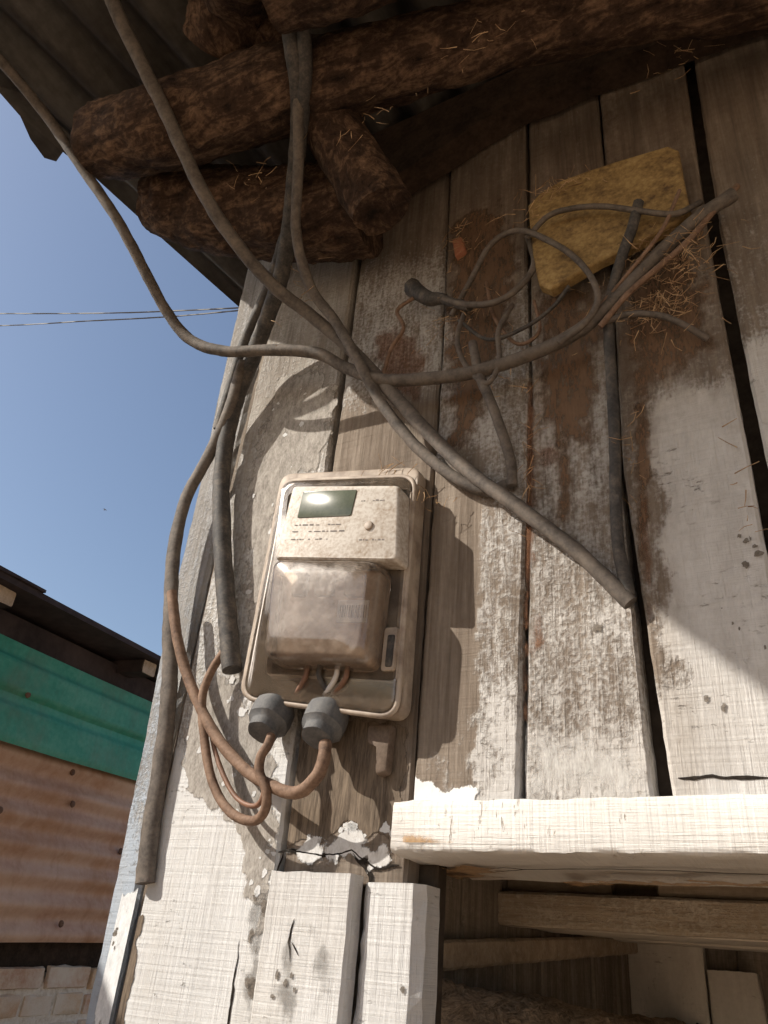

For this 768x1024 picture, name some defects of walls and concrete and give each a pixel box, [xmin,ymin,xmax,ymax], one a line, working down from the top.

water stain [443,209,519,370]
water stain [537,289,594,342]
water stain [446,376,486,449]
water stain [534,326,603,520]
peeling [181,674,478,999]
crack [287,920,298,958]
crack [227,944,239,1024]